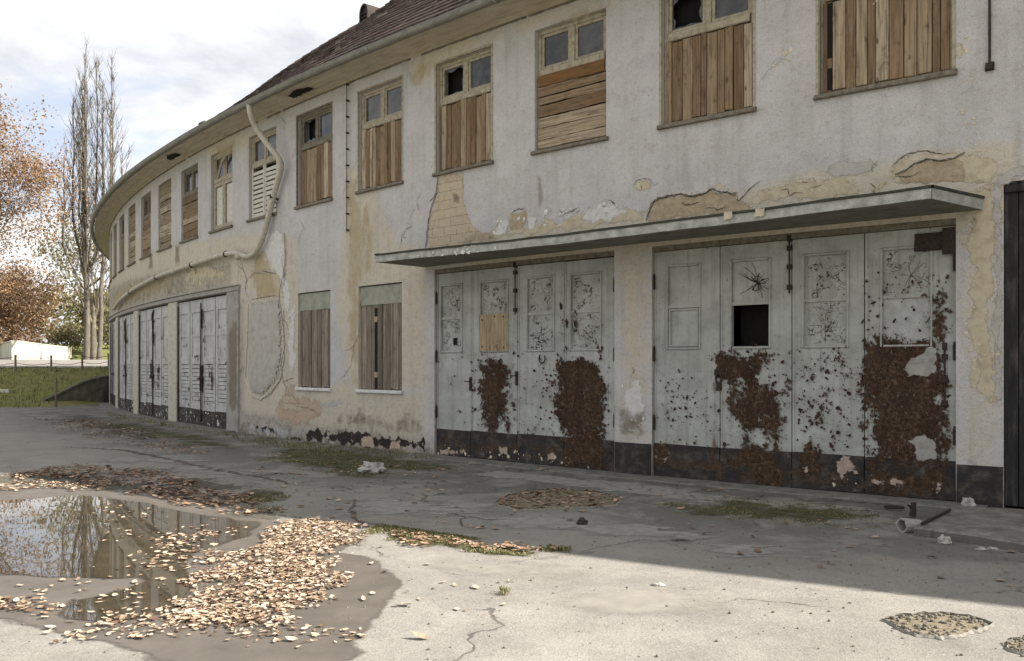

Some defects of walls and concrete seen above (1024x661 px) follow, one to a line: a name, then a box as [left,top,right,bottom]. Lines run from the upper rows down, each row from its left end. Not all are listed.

flaking render [249,231,469,456]
peeling [483,446,572,464]
corrosion [457,303,612,471]
flaking render [417,109,1024,405]
corrosion [653,271,956,500]